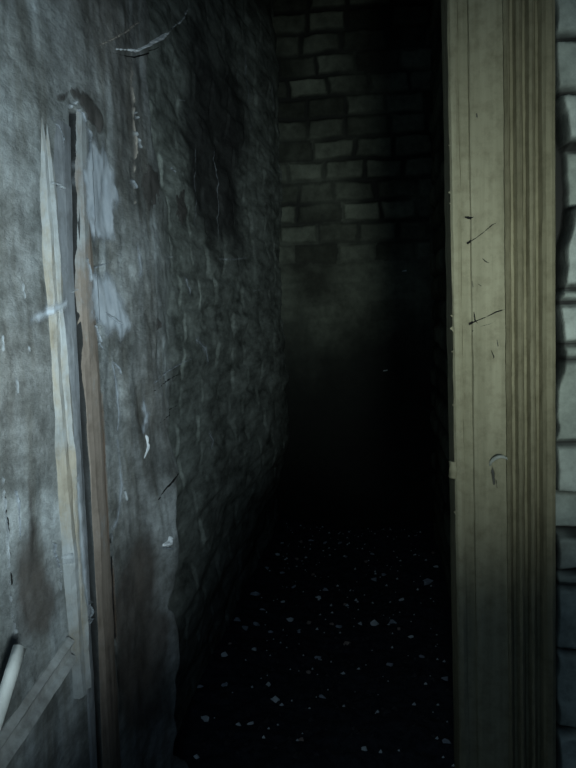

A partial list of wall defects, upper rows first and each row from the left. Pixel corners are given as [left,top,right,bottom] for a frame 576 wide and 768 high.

peeling [58,89,118,239]